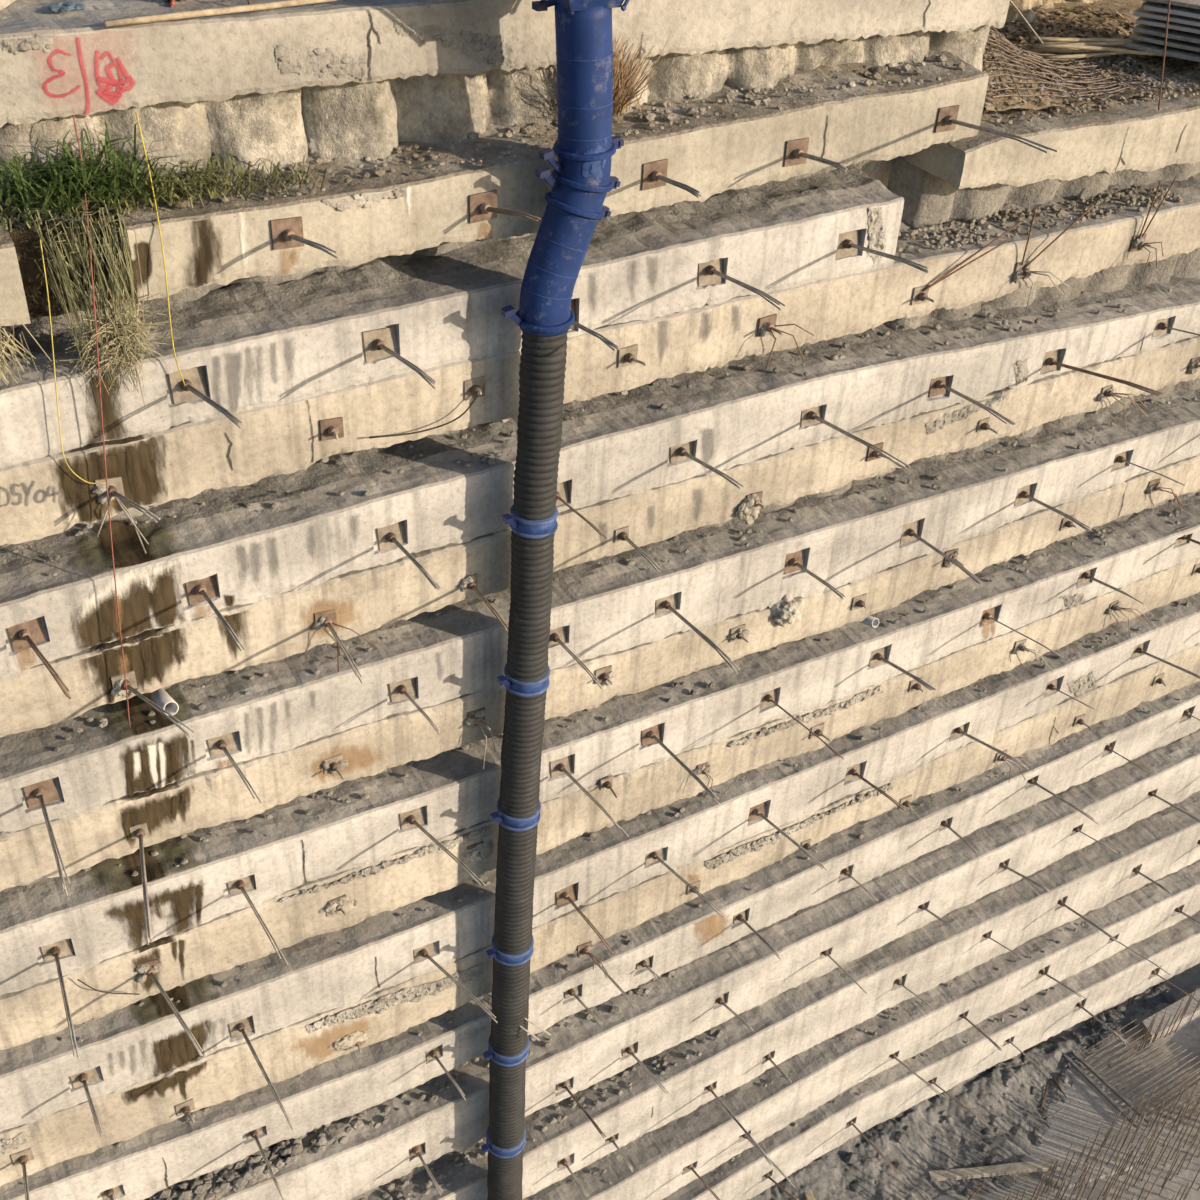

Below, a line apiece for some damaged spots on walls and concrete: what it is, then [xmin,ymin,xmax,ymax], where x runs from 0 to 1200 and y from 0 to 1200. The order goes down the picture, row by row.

damp [56,370,165,523]
damp [73,560,186,703]
damp [120,736,194,844]
damp [107,883,203,990]
spalling [305,965,482,1033]
damp [110,1021,215,1102]